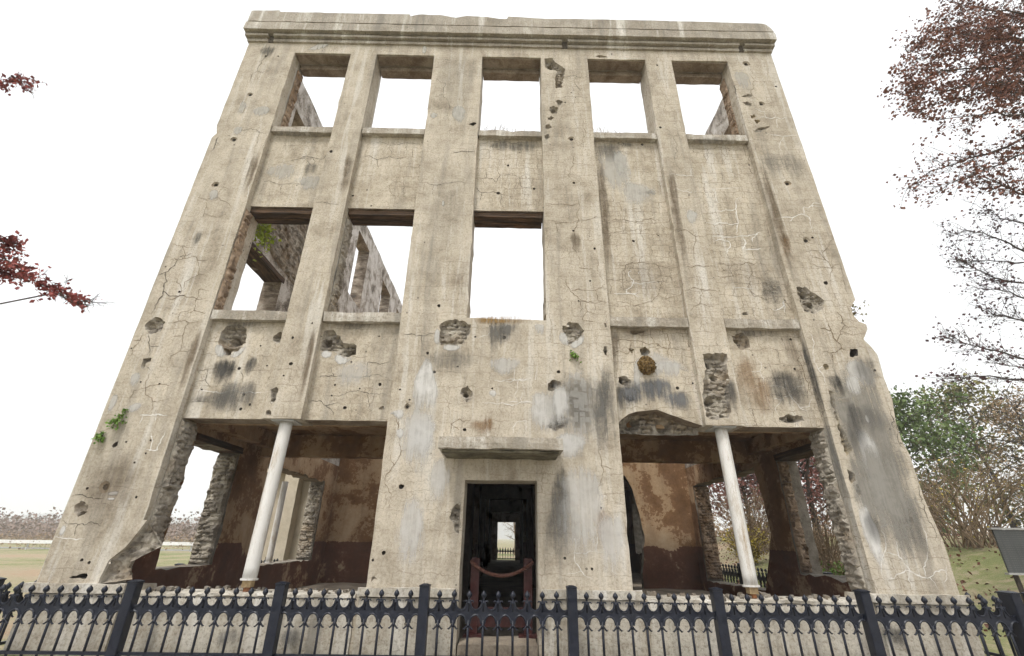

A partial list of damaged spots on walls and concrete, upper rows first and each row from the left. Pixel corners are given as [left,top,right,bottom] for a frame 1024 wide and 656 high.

spalling [544,58,565,140]
crack [431,73,848,360]
crack [129,244,268,451]
water stain [204,345,256,405]
spalling [218,324,247,356]
spalling [320,330,357,357]
spalling [439,319,471,346]
spalling [562,322,584,346]
water stain [531,362,688,456]
spalling [702,352,732,420]
spalling [796,286,825,314]
water stain [774,345,915,561]